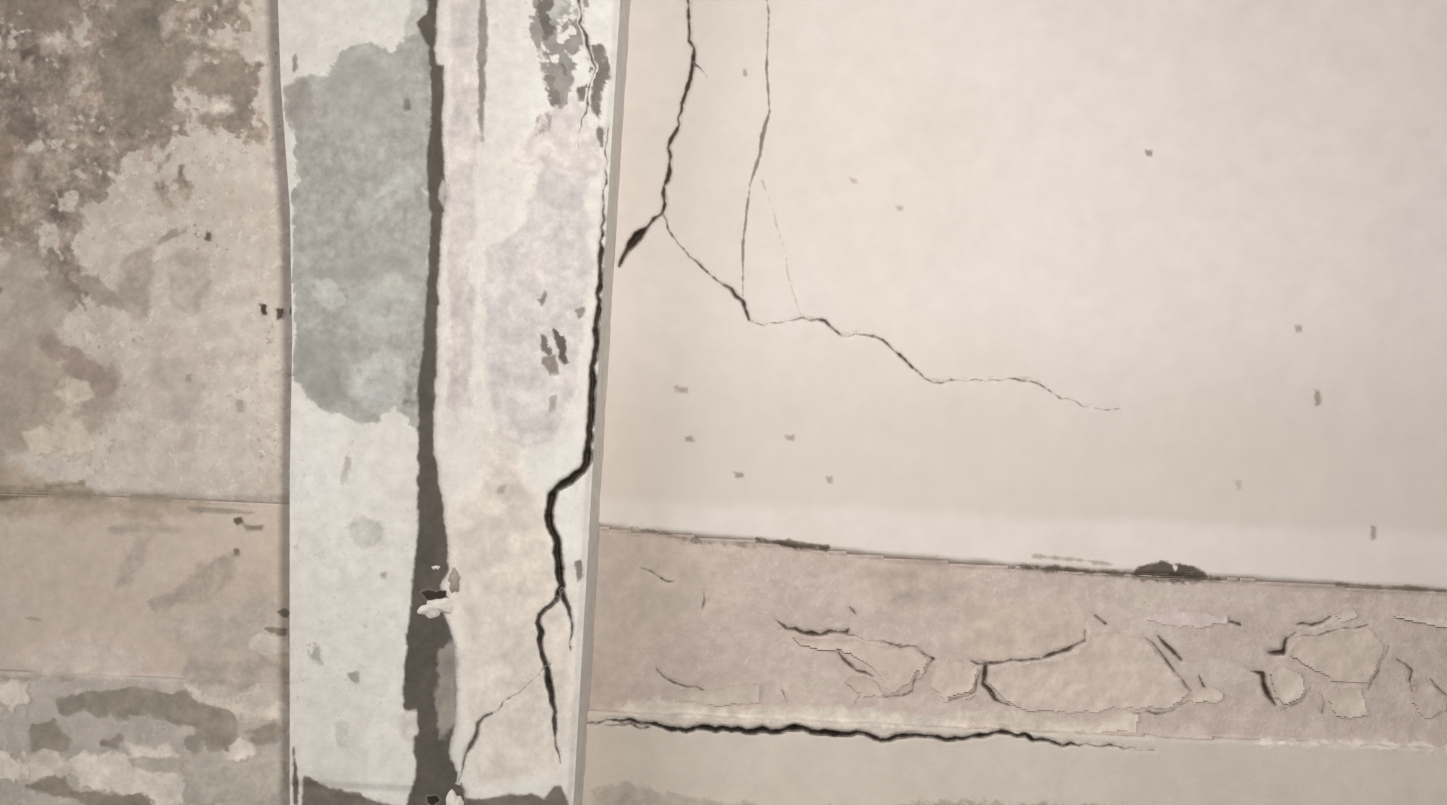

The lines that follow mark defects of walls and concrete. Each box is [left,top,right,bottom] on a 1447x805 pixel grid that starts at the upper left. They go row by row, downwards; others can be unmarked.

water stain [0,0,268,585]
peeling [259,0,610,805]
crack [459,0,1155,779]
spalling [234,517,263,530]
spalling [249,608,289,656]
peeling [619,631,1223,737]
crack [1137,635,1205,715]
peeling [1147,607,1227,628]
peeling [1270,607,1383,719]
crack [1251,615,1447,713]
peeling [0,679,389,805]
peeling [1254,739,1447,755]